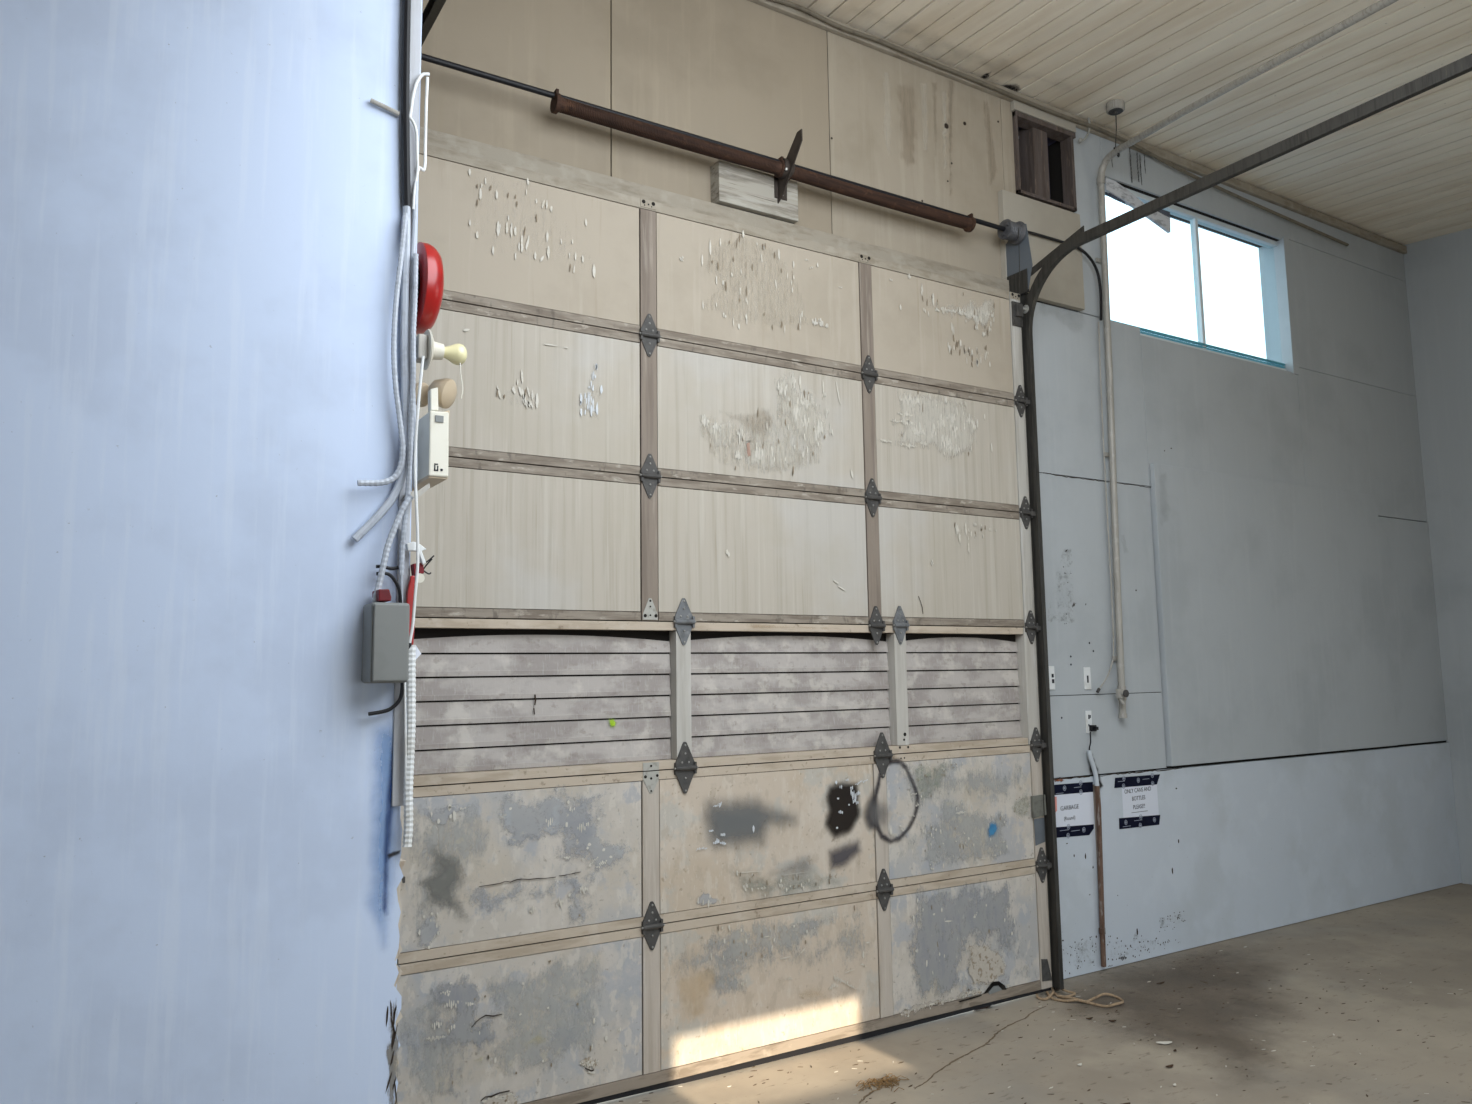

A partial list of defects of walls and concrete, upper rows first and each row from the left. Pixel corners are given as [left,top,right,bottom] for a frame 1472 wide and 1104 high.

peeling [468,169,596,278]
peeling [680,230,828,333]
peeling [472,788,625,921]
peeling [899,884,1015,1017]
peeling [385,1000,398,1104]
peeling [426,977,495,1053]